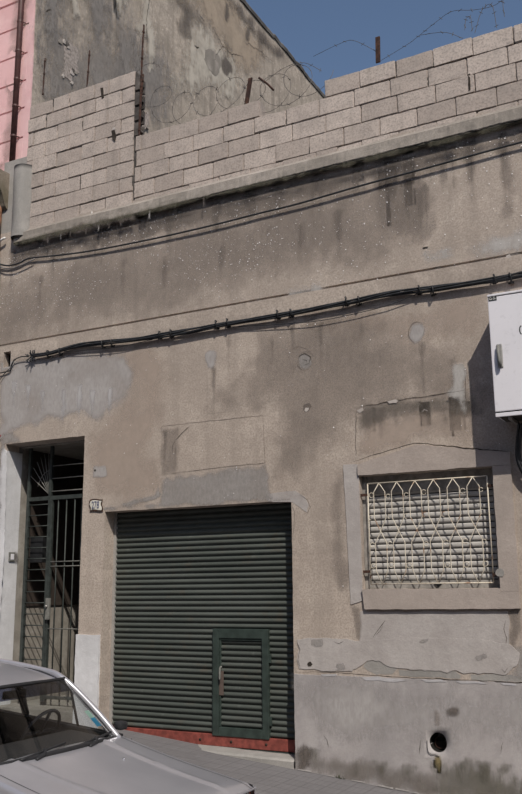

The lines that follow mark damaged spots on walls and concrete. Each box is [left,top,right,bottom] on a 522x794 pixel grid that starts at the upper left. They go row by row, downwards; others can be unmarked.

flaking render [58,39,91,87]
crack [322,672,522,683]
spalling [361,660,522,686]
water stain [298,746,311,769]